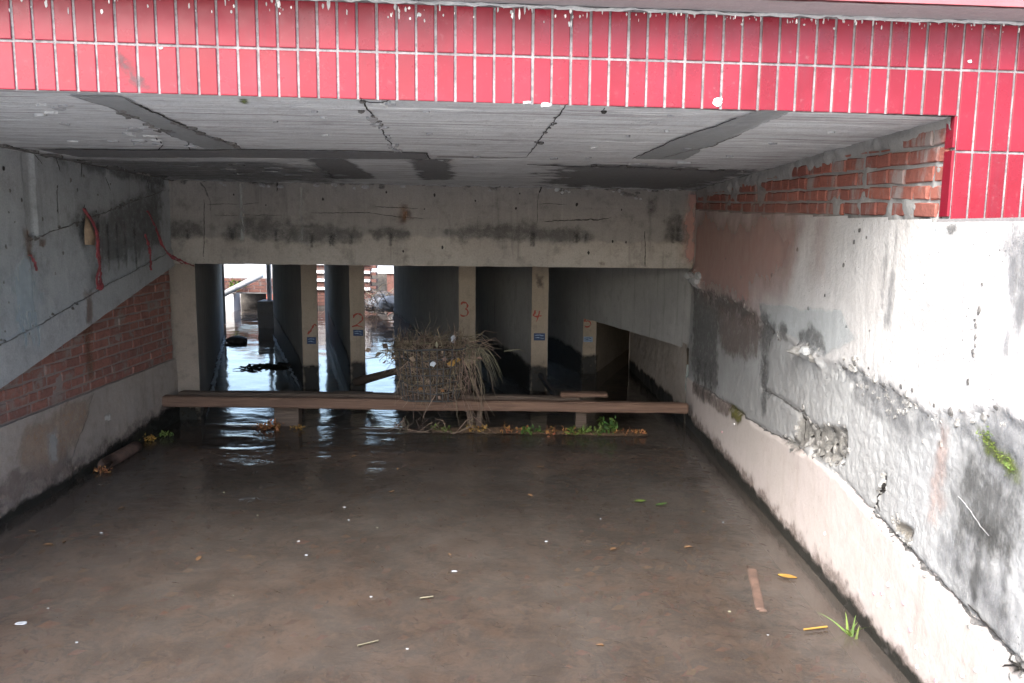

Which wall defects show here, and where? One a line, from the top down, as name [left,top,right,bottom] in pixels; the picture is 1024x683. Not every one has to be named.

water stain [40,149,455,240]
crack [358,97,402,153]
crack [469,104,567,158]
water stain [527,164,754,190]
water stain [691,288,719,402]
water stain [760,313,825,413]
spalling [688,287,1024,681]
crack [870,473,1024,671]
water stain [941,419,1024,643]